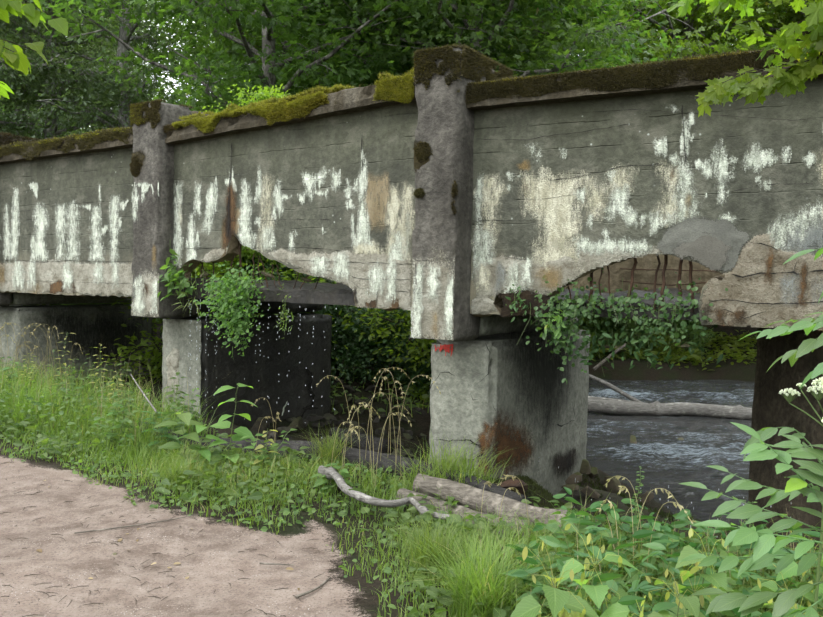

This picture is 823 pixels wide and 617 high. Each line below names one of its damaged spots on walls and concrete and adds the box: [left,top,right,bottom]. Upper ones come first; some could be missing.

efflorescence [0,188,20,260]
efflorescence [30,182,159,265]
spalling [200,247,228,262]
efflorescence [173,151,415,267]
efflorescence [472,173,511,278]
spalling [471,246,663,319]
efflorescence [524,113,790,271]
efflorescence [768,205,823,252]
efflorescence [803,153,823,179]
rust [477,412,535,478]